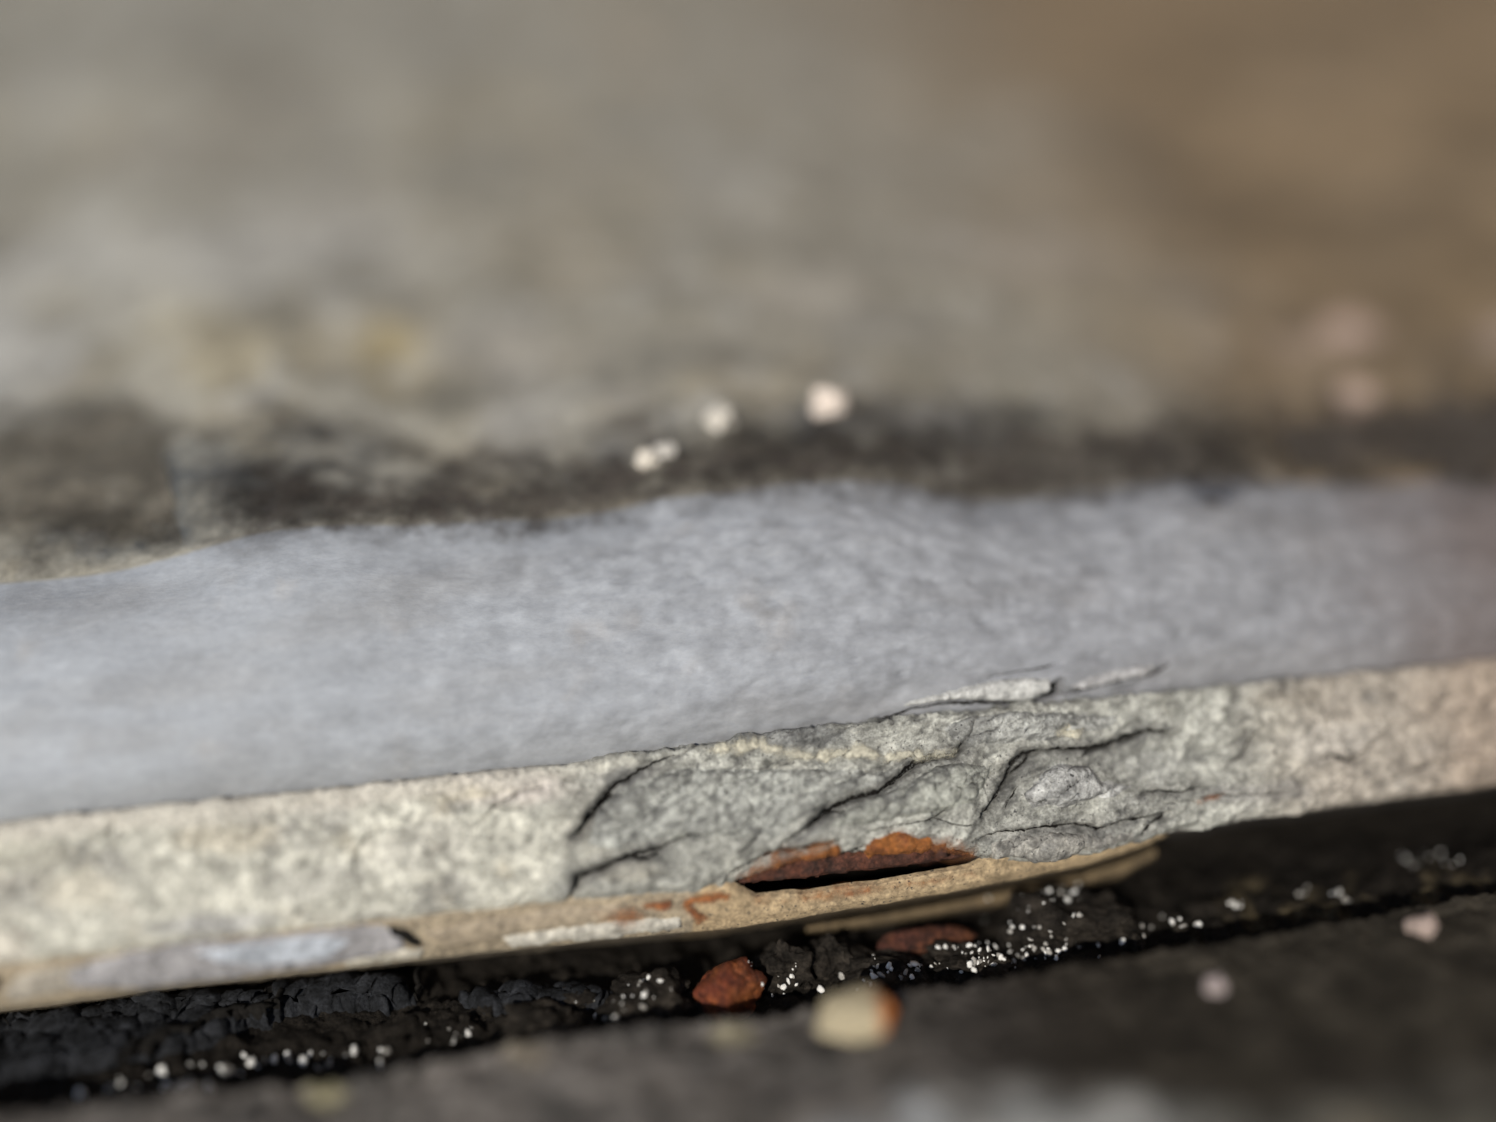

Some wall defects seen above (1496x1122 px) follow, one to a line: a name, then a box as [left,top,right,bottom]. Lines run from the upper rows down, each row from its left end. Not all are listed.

crack [1315,724,1393,762]
crack [474,786,542,828]
crack [573,756,670,836]
crack [572,834,702,890]
spalling [0,658,1496,1020]
rust [618,832,974,925]
crack [726,728,1284,877]